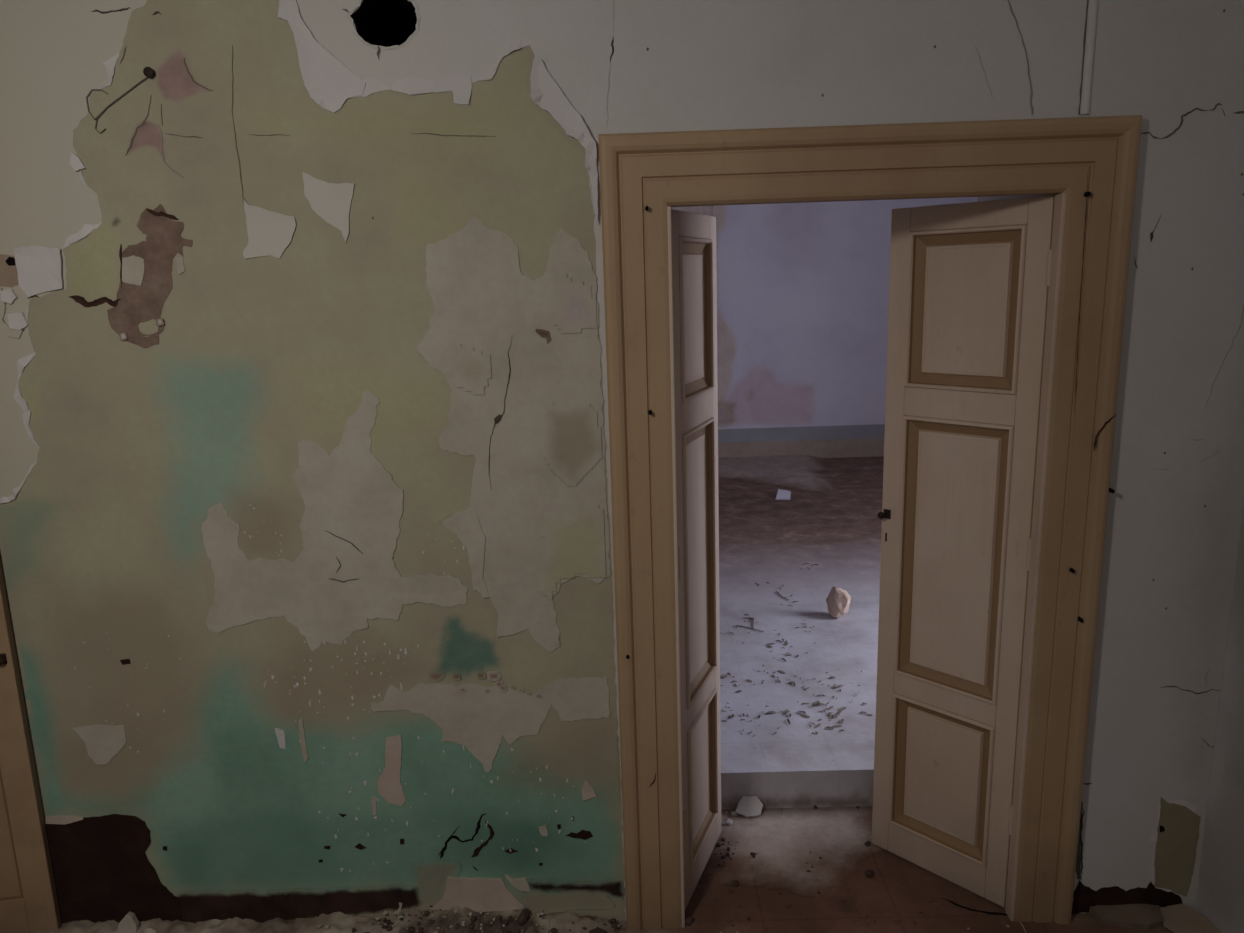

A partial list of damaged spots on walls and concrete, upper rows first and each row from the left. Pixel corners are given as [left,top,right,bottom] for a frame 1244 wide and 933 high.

crack [606,0,614,129]
crack [1008,0,1034,115]
crack [1141,103,1244,139]
crack [1134,214,1162,269]
flaking render [718,397,739,429]
flaking render [0,534,182,923]
crack [438,813,494,871]
peeling [1072,796,1201,914]